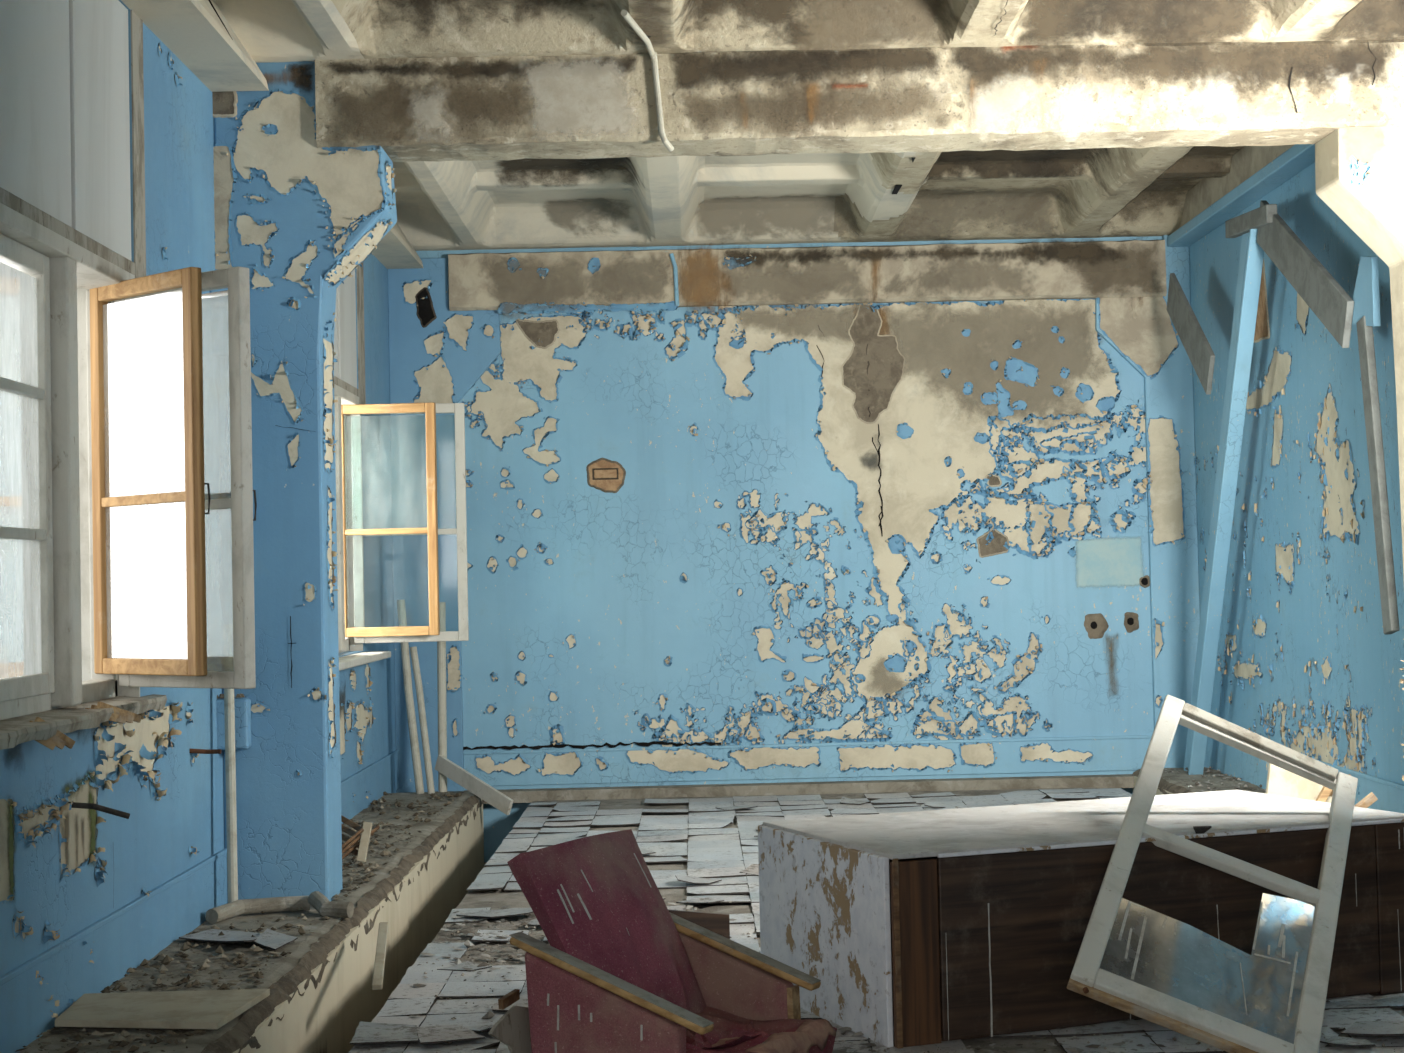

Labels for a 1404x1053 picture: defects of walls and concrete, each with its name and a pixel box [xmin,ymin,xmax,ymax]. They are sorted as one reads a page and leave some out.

peeling [212,89,397,311]
leakage [330,56,637,149]
leakage [498,157,639,229]
leakage [636,0,965,130]
leakage [698,148,1160,417]
leakage [1114,146,1237,219]
leakage [955,0,1404,129]
peeling [302,312,339,611]
peeling [402,278,1219,777]
peeling [1217,258,1377,802]
peeling [0,700,193,945]
crack [463,741,721,750]